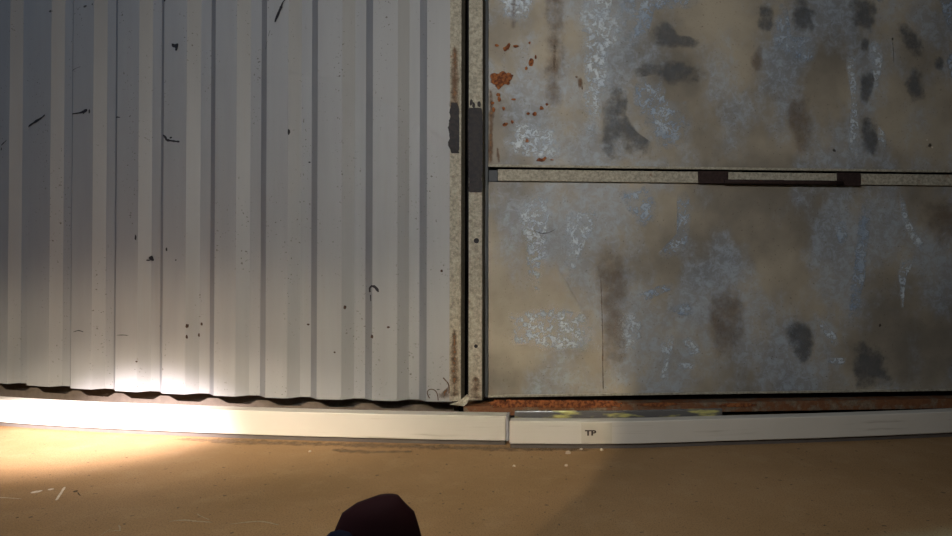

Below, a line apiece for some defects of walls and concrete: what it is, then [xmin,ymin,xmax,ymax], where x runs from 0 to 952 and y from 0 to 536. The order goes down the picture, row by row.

leakage [861,75,874,99]
corrosion [489,71,516,161]
leakage [604,91,648,149]
leakage [788,324,812,361]
corrosion [473,377,623,408]